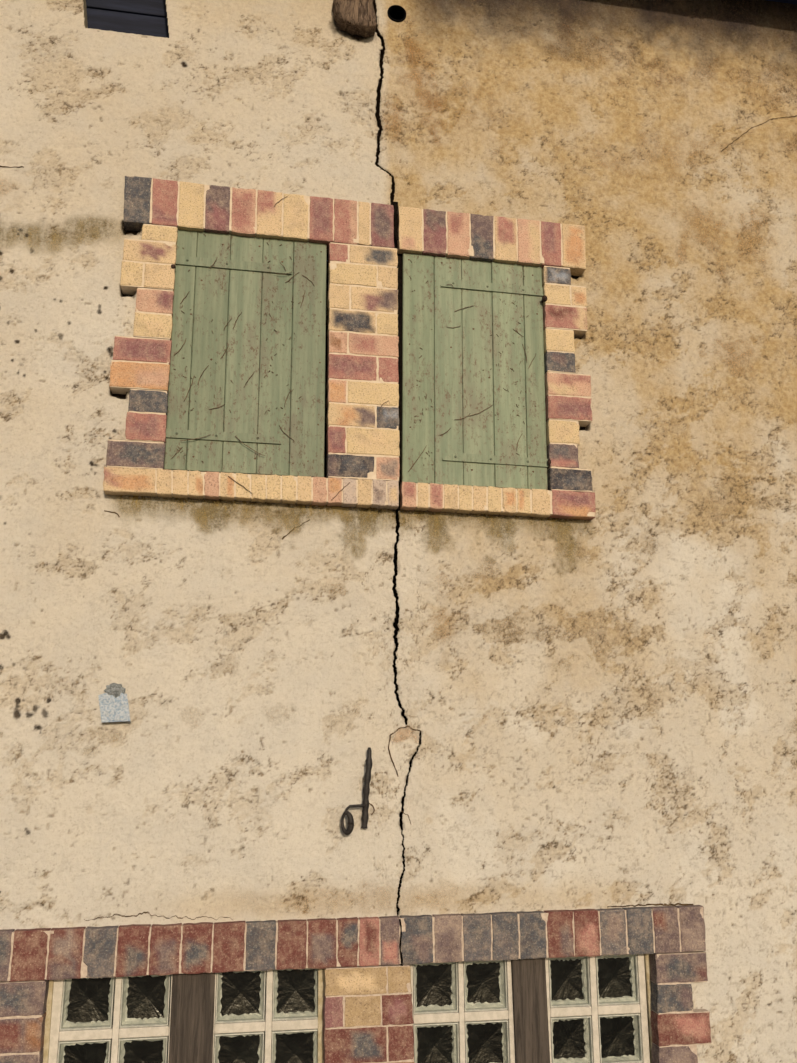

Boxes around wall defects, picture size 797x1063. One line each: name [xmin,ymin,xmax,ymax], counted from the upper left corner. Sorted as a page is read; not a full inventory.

crack [373,0,422,966]
crack [722,115,797,151]